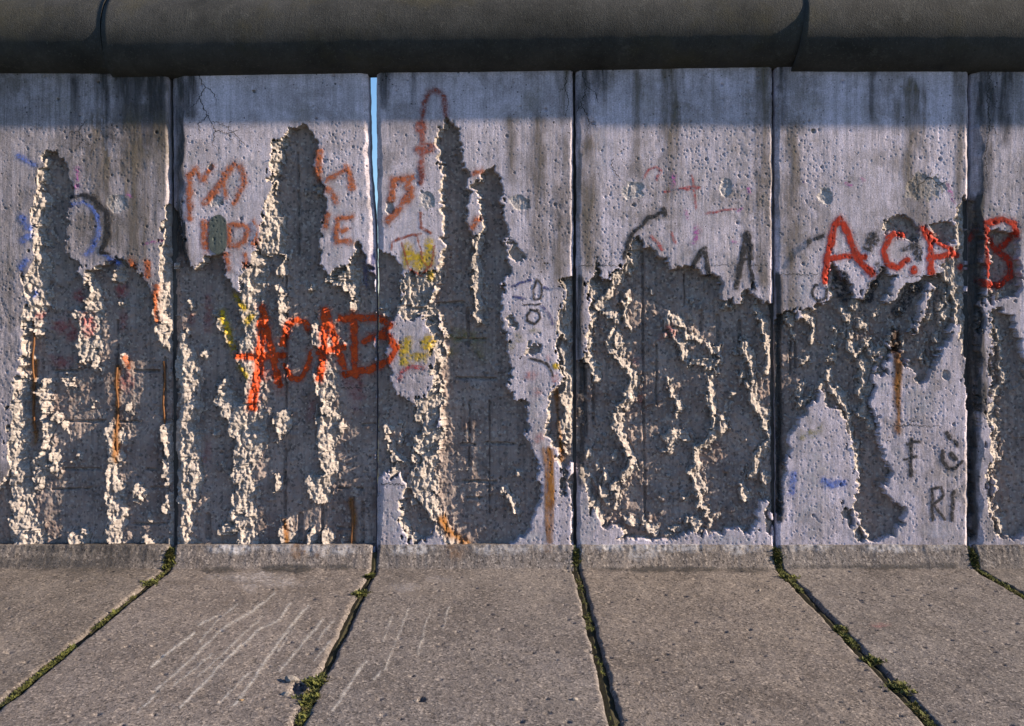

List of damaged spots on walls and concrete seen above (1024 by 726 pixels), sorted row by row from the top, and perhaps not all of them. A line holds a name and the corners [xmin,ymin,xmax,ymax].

crack [190,76,246,157]
damp [904,79,919,190]
corrosion [112,365,120,462]
spalling [0,117,1024,552]
corrosion [543,389,563,542]
corrosion [890,330,902,433]